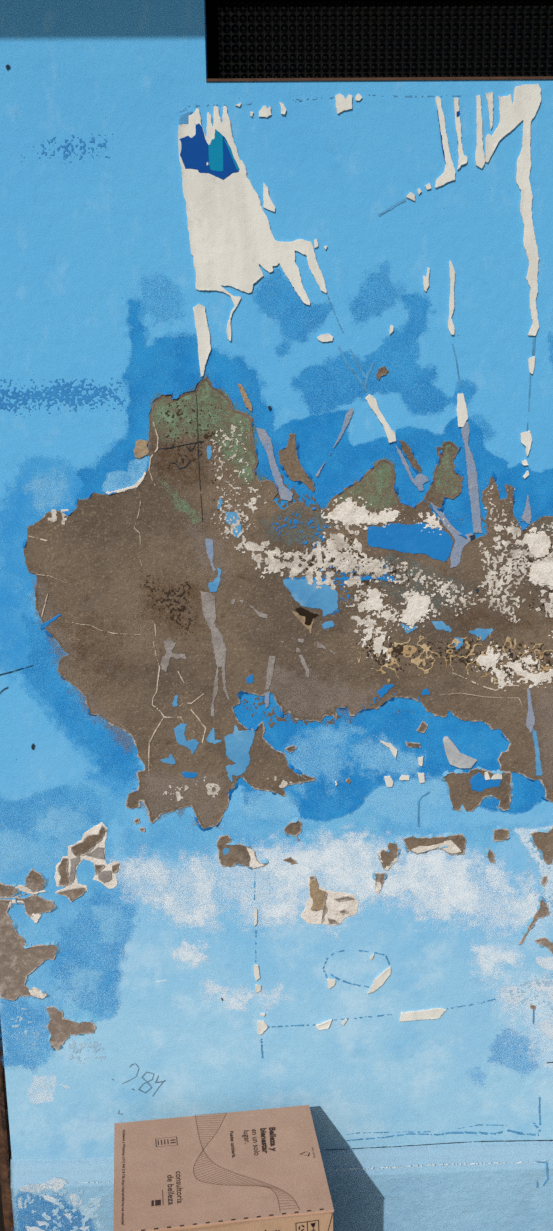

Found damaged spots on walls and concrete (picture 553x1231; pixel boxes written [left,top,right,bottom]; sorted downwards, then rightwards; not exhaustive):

flaking render [0,294,553,1073]
peeling [14,1178,107,1231]